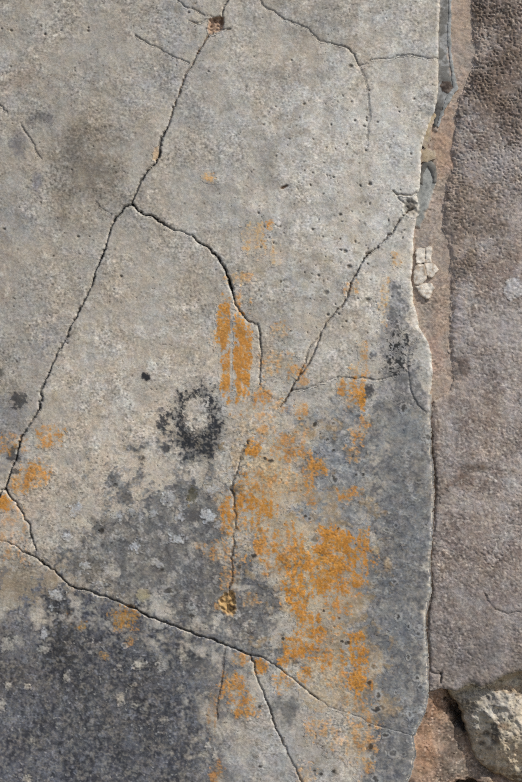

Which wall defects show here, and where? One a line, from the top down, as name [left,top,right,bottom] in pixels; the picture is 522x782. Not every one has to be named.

crack [0,0,414,782]
crack [430,432,438,532]
damp [0,367,302,782]
crack [427,572,443,683]
spalling [408,688,516,782]